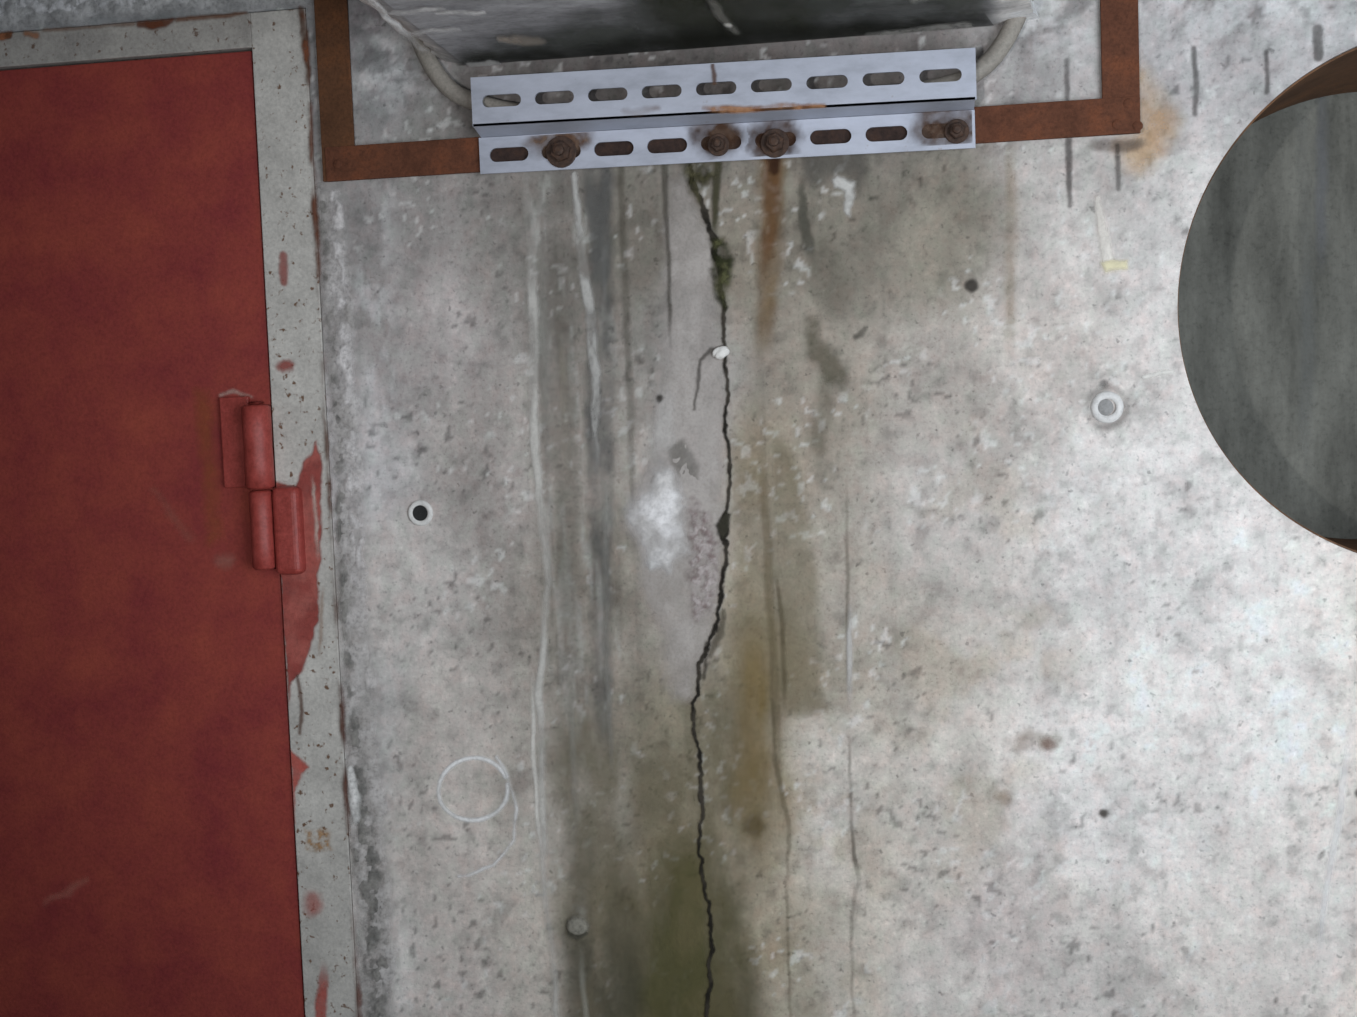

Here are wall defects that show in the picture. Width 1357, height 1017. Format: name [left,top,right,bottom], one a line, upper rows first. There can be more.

leakage [528,284,537,328]
leakage [530,388,542,508]
leakage [572,168,609,314]
leakage [588,334,600,436]
leakage [628,187,721,697]
spalling [276,190,397,1017]
crack [685,162,734,1017]
leakage [531,629,547,849]
leakage [641,853,710,1017]